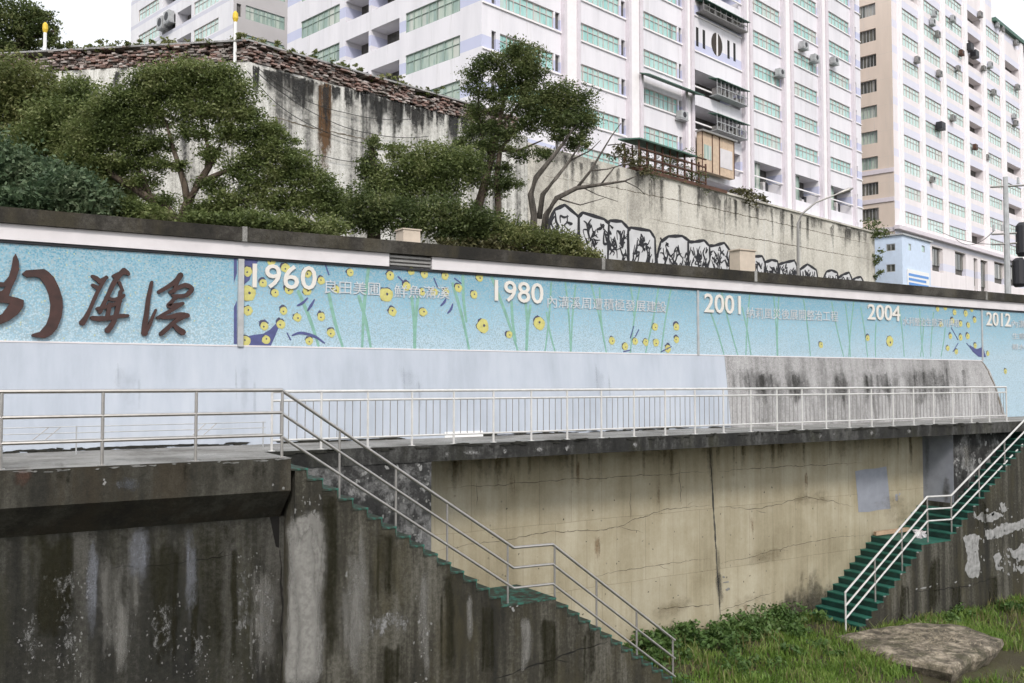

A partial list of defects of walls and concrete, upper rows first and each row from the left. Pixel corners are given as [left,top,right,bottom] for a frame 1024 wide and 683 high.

damp [253,66,469,167]
crack [437,455,864,621]
peeling [955,502,1024,586]
damp [87,533,146,667]
damp [173,548,198,644]
damp [250,574,276,662]
damp [332,537,405,668]